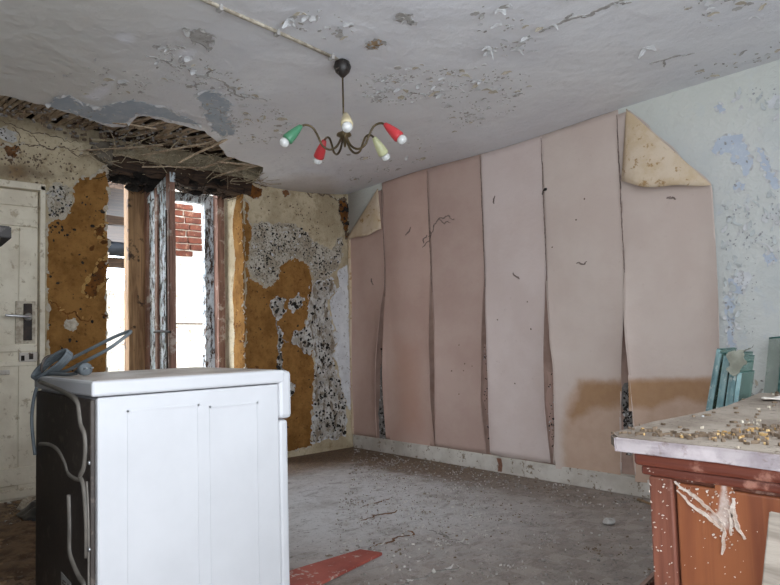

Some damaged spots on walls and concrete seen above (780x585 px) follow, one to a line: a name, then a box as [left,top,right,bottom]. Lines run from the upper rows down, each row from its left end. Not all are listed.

spalling [0,125,23,162]
peeling [45,27,293,144]
crack [145,55,267,114]
peeling [356,4,544,132]
crack [539,0,632,33]
spalling [45,164,111,373]
spalling [231,183,351,452]
peeling [709,133,780,352]
water stain [545,371,719,483]